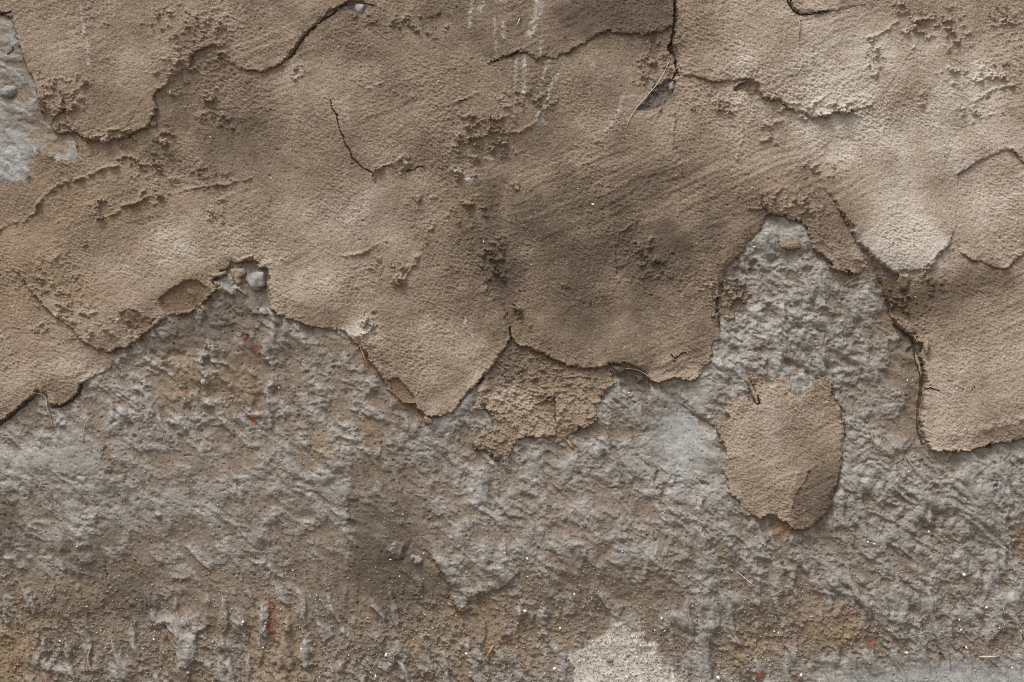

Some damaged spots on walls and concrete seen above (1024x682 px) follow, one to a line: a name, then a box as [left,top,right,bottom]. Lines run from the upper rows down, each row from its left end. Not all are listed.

crack [667,0,680,78]
crack [330,99,425,184]
spalling [120,268,247,333]
crack [893,323,940,445]